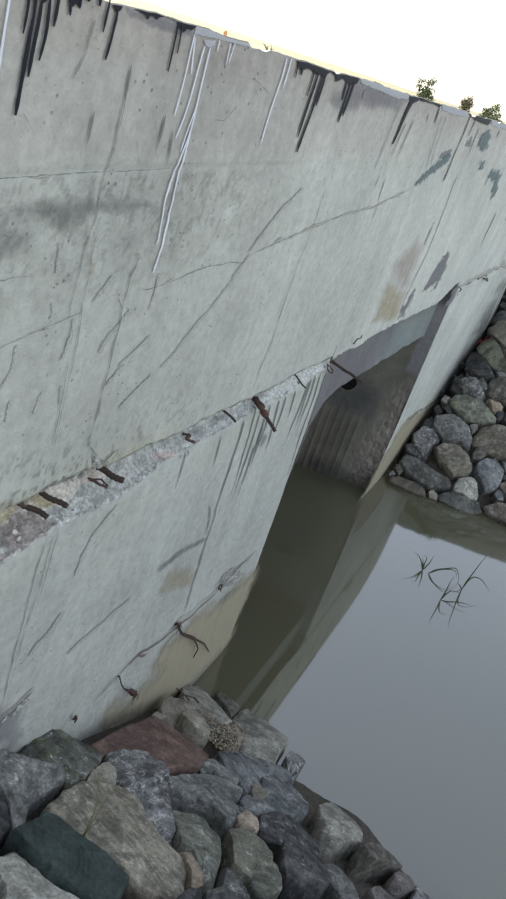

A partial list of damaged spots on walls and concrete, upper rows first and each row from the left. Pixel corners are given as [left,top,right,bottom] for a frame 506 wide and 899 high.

leakage [0,0,11,67]
leakage [14,0,119,116]
leakage [149,17,236,273]
leakage [261,58,414,168]
crack [404,173,459,301]
crack [88,176,408,463]
spalling [0,360,363,566]
leakage [224,371,327,498]